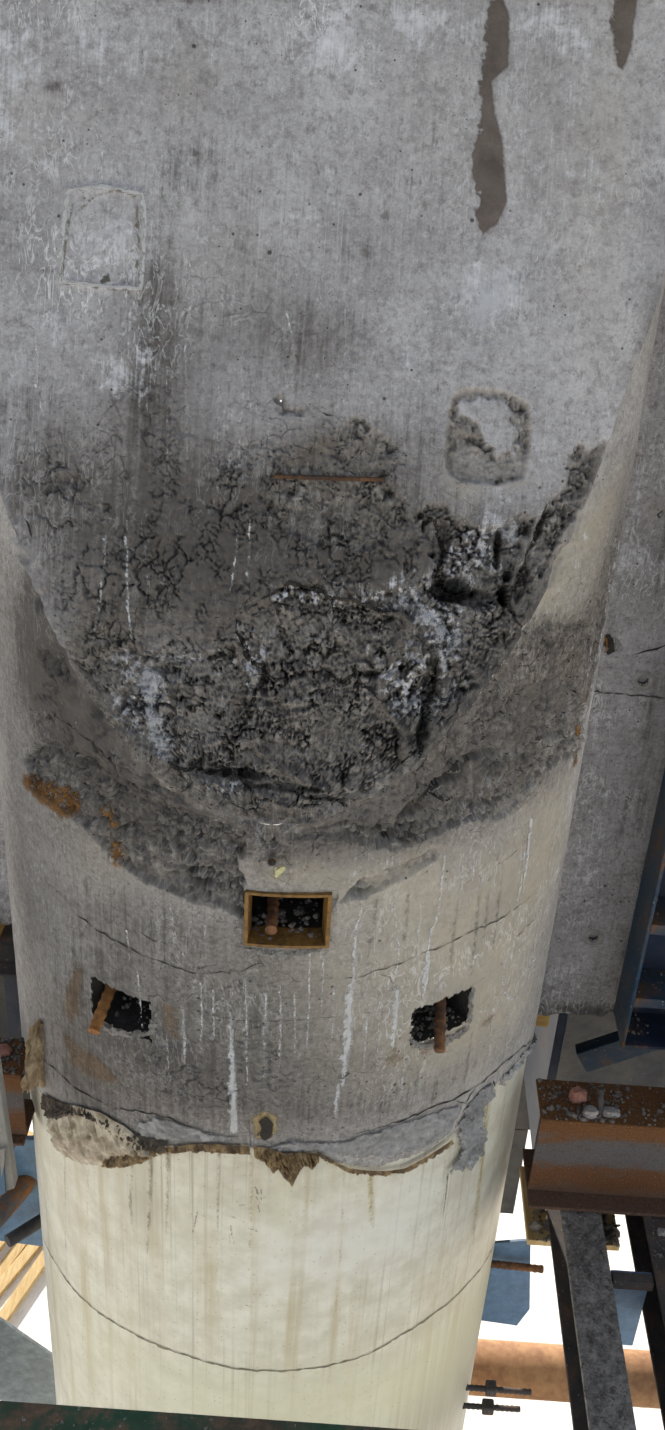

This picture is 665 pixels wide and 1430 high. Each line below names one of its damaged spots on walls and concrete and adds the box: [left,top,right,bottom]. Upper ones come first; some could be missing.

damp [609,0,637,69]
damp [472,0,509,233]
spalling [442,385,534,488]
spalling [22,412,609,961]
corrosion [23,774,81,817]
crack [349,897,534,982]
spalling [87,983,158,1038]
spalling [410,988,475,1053]
peeling [134,1117,236,1142]